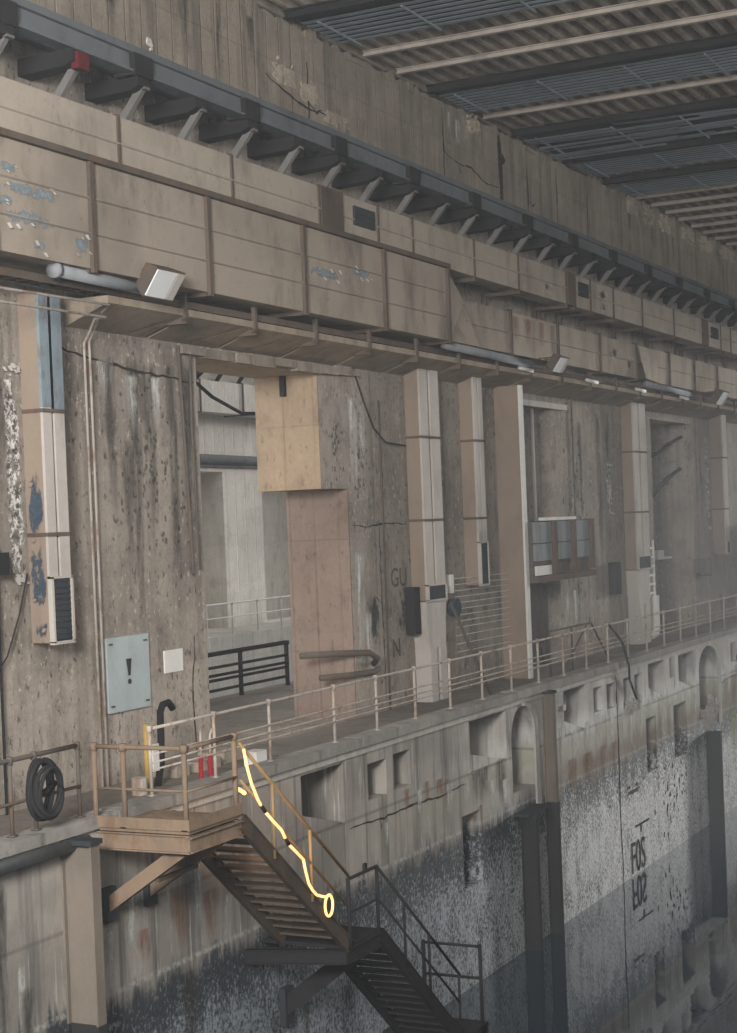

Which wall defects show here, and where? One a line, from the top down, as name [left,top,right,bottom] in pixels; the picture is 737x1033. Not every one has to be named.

peeling [0,162,57,257]
crack [441,107,558,223]
leakage [102,362,114,453]
leakage [124,369,194,534]
crack [350,783,467,829]
leakage [19,972,32,1033]